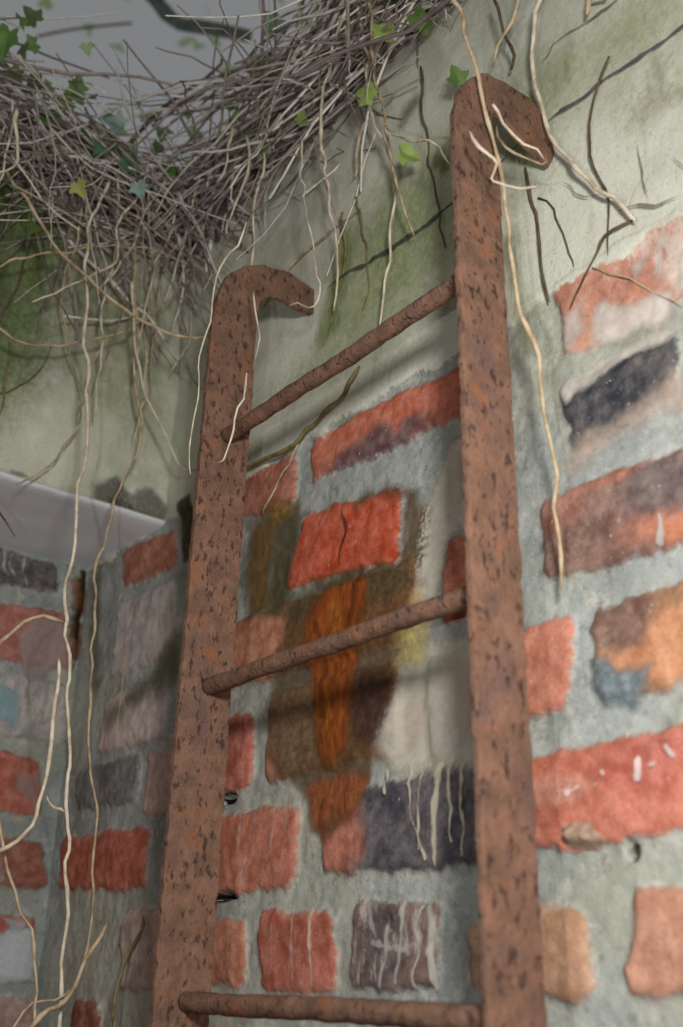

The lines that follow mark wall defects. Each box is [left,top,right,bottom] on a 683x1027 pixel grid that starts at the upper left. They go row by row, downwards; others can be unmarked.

crack [543,0,616,60]
crack [548,24,683,121]
crack [329,202,453,287]
crack [339,502,347,560]
water stain [416,438,464,602]
water stain [373,621,473,865]
water stain [367,900,439,991]